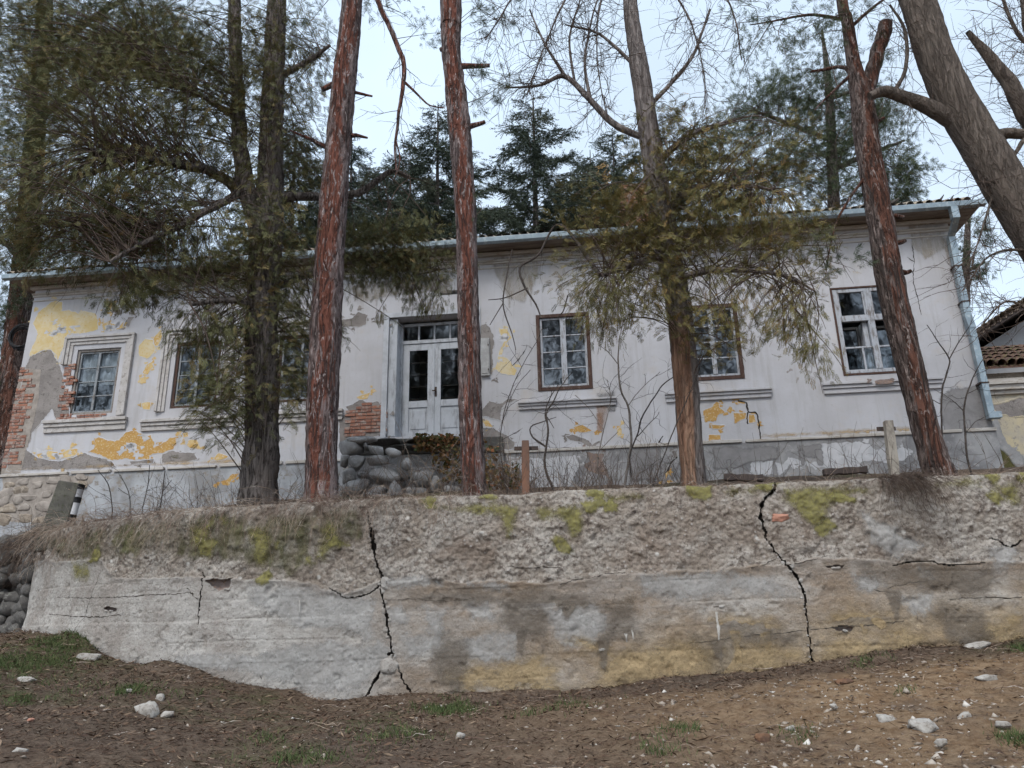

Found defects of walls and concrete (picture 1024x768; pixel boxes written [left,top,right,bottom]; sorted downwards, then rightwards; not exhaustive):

peeling [480,322,521,383]
spalling [0,297,228,526]
spalling [338,385,395,443]
peeling [702,399,763,441]
crack [738,400,761,439]
spalling [992,396,1024,467]
crack [50,558,206,628]
crack [329,512,471,696]
water stain [406,582,799,694]
crack [691,482,1022,662]